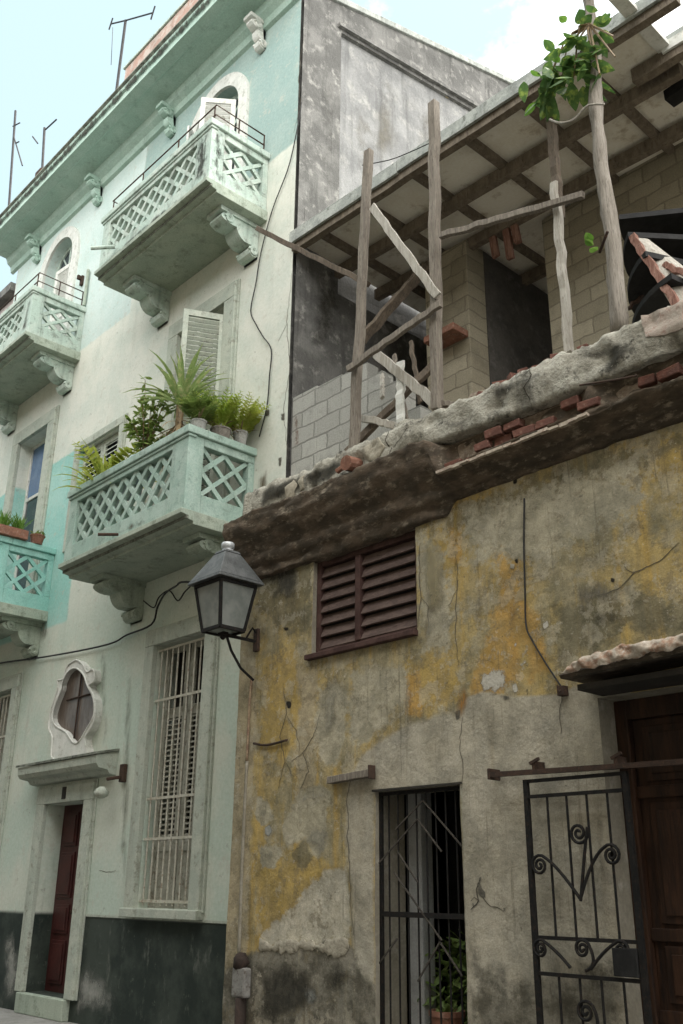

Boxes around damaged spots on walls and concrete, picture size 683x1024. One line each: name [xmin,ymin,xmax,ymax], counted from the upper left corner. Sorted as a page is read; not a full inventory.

peeling [363,437,386,461]
flaking render [436,362,683,474]